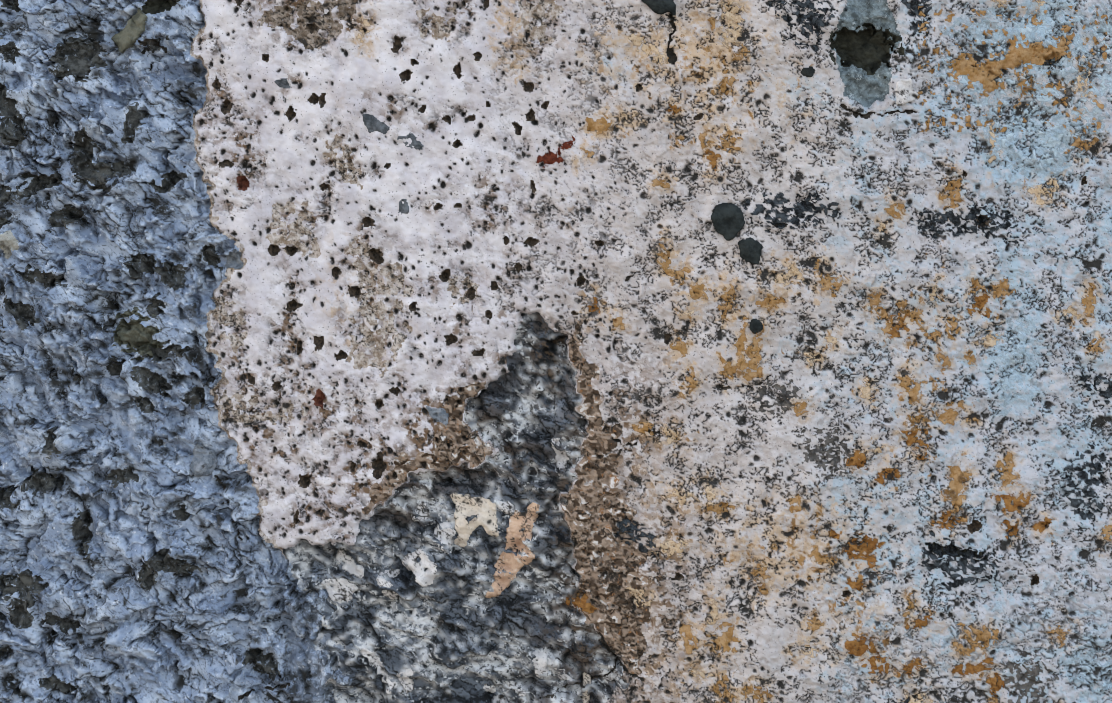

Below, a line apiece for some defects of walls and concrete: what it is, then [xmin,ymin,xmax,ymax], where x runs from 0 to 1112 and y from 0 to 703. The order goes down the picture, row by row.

spalling [190,0,650,703]